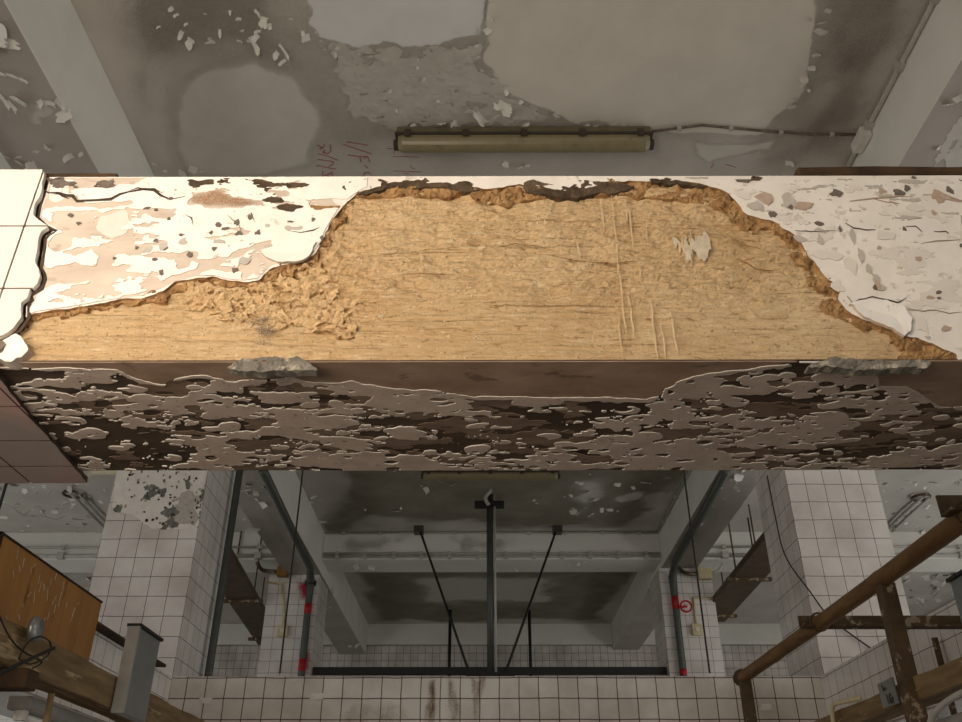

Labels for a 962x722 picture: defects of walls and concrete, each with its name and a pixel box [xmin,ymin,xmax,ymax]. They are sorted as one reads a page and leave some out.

peeling [0,23,21,55]
peeling [168,6,222,51]
peeling [228,9,272,56]
peeling [273,44,289,67]
peeling [0,94,72,127]
damp [96,0,914,177]
peeling [301,0,832,164]
peeling [934,94,962,167]
peeling [3,145,52,170]
crack [1,181,193,340]
spalling [0,163,962,534]